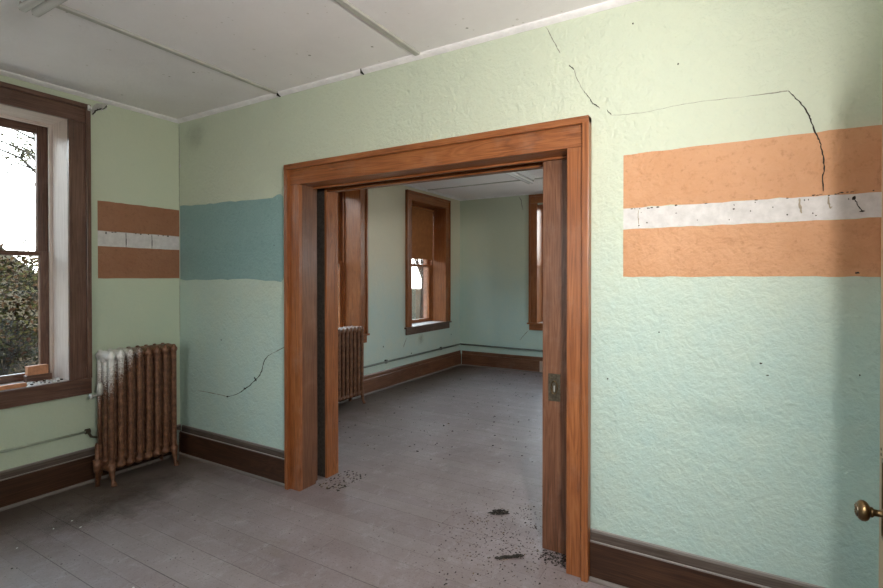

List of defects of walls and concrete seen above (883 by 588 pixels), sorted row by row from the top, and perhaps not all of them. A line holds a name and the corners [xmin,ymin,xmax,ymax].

crack [547,29,825,191]
crack [198,347,284,397]